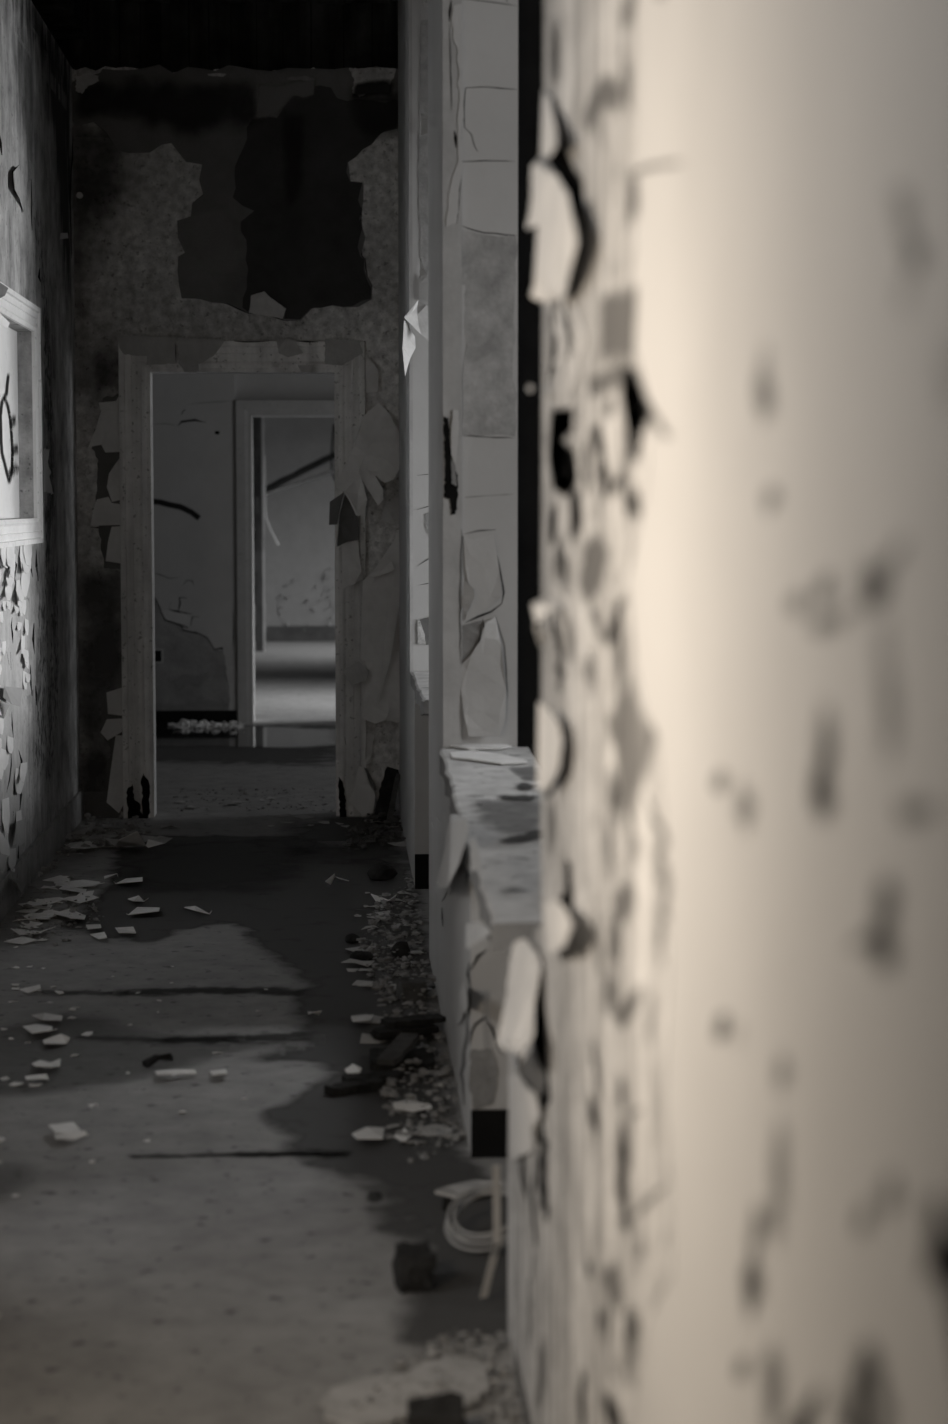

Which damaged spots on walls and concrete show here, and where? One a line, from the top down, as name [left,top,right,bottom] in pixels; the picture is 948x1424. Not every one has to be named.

peeling [72,65,398,321]
peeling [402,19,428,375]
peeling [88,394,121,570]
peeling [0,544,40,894]
peeling [100,687,123,813]
flaking render [155,598,230,729]
peeling [278,567,335,630]
peeling [446,0,682,1424]
peeling [104,873,143,884]
peeling [431,807,482,926]
peeling [345,1064,362,1074]
peeling [392,1100,432,1112]